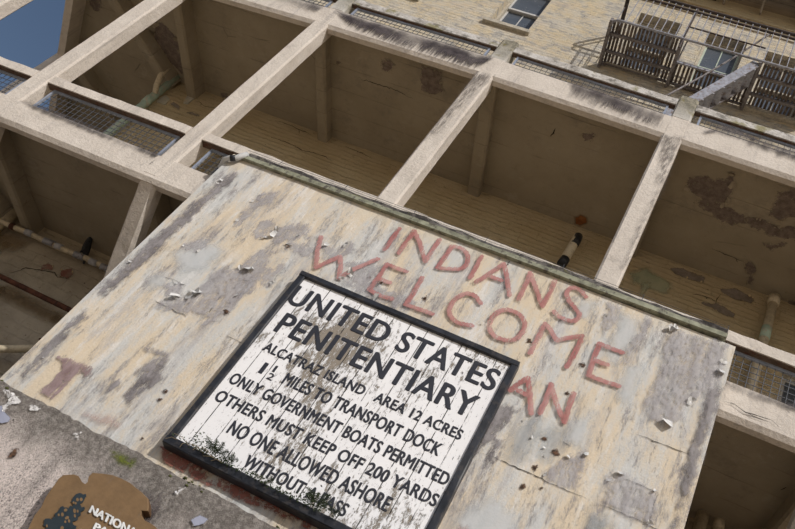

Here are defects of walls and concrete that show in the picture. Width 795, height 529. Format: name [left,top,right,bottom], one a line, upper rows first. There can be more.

damp [337,11,492,131]
damp [571,82,661,124]
peeling [235,192,276,226]
peeling [683,173,795,251]
peeling [158,218,427,330]